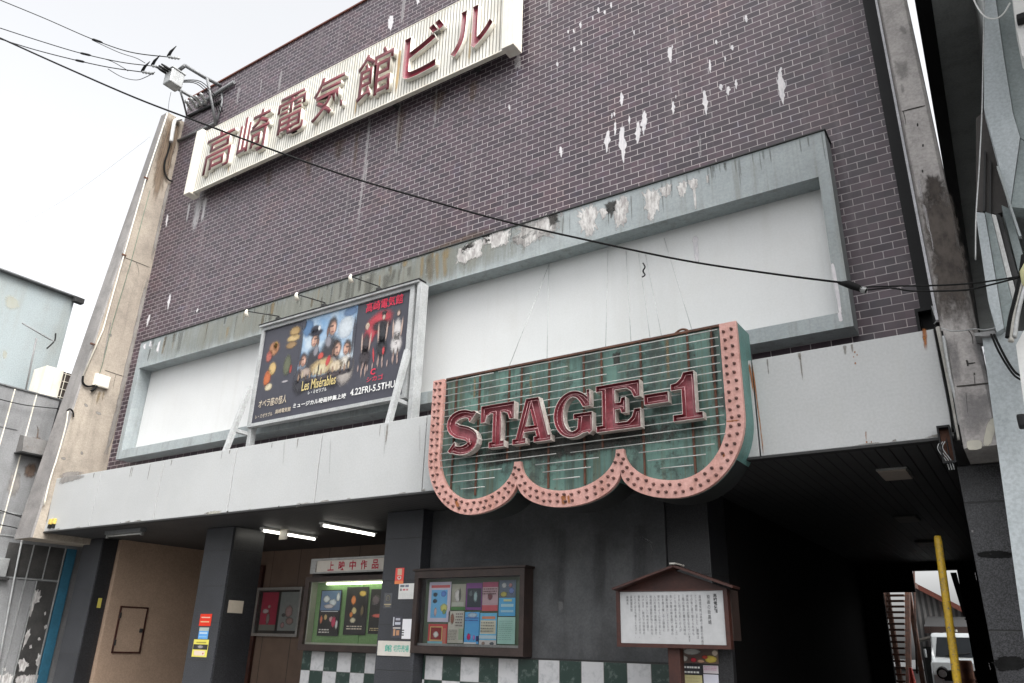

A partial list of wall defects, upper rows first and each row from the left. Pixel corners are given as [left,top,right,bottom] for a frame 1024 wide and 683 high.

peeling [777,67,786,105]
peeling [604,93,647,163]
peeling [456,210,563,264]
peeling [577,195,629,237]
peeling [642,174,709,223]
damp [921,176,970,317]